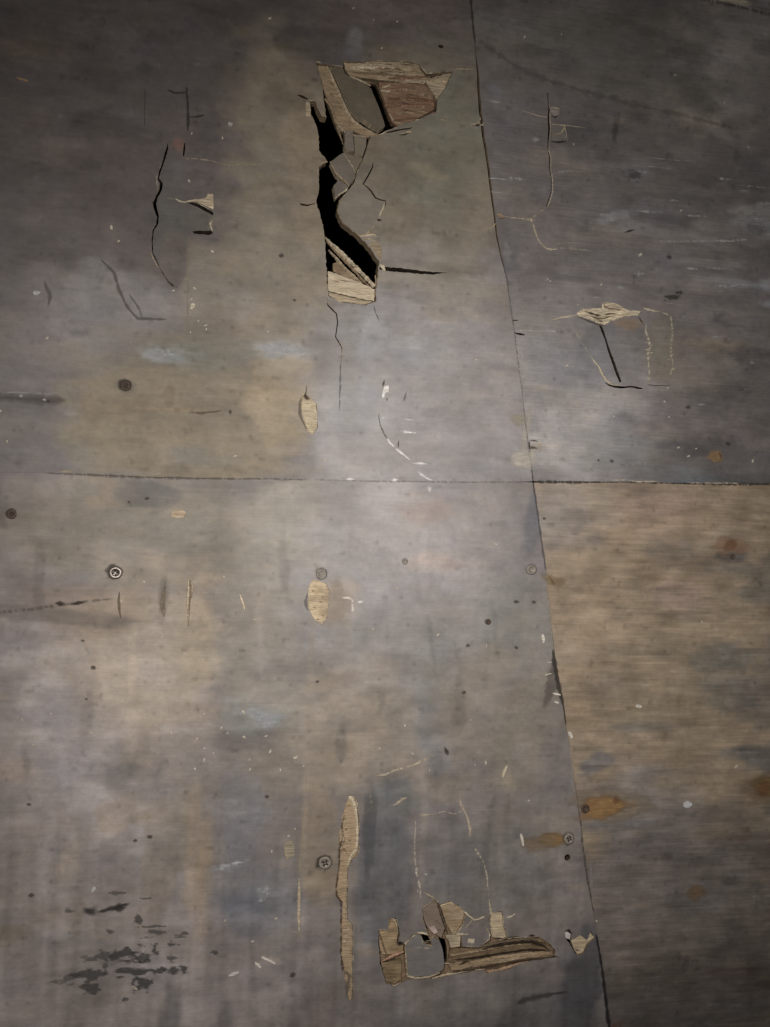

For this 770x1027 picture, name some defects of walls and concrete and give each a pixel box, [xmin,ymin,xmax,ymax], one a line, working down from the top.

crack [151,88,203,286]
spalling [299,387,318,435]
spalling [305,579,330,625]
spalling [335,796,360,1000]
spalling [565,929,594,955]